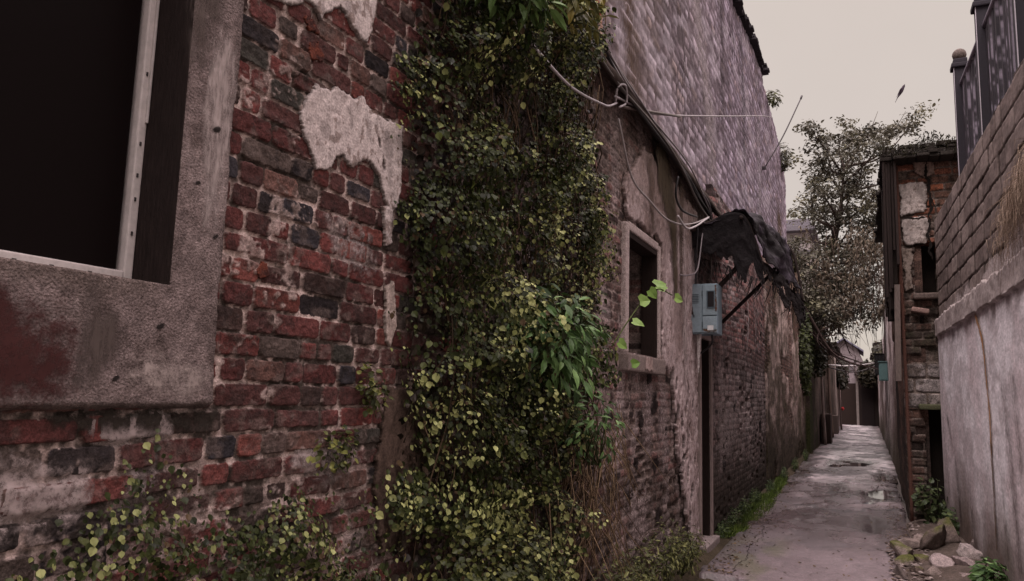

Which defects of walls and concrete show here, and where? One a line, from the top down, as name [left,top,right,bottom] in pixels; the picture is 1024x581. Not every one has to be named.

peeling [275,0,377,43]
peeling [298,83,403,246]